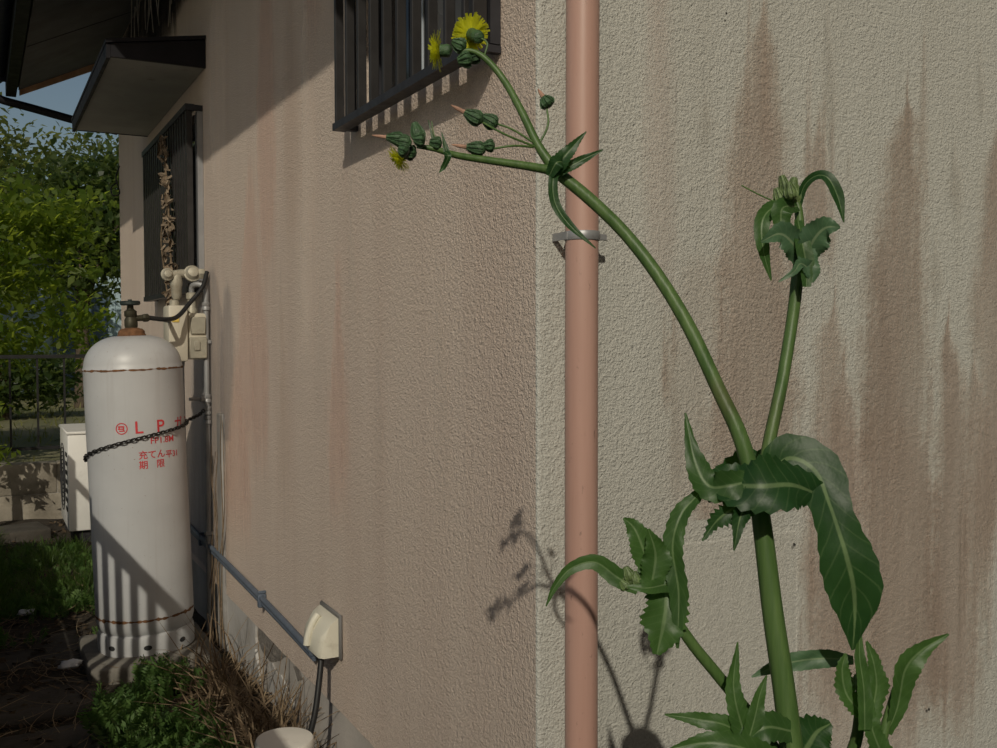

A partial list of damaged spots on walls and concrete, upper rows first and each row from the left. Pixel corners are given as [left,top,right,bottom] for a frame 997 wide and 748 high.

water stain [726,425,736,457]
water stain [767,242,787,377]
water stain [848,215,902,513]
water stain [925,316,974,701]